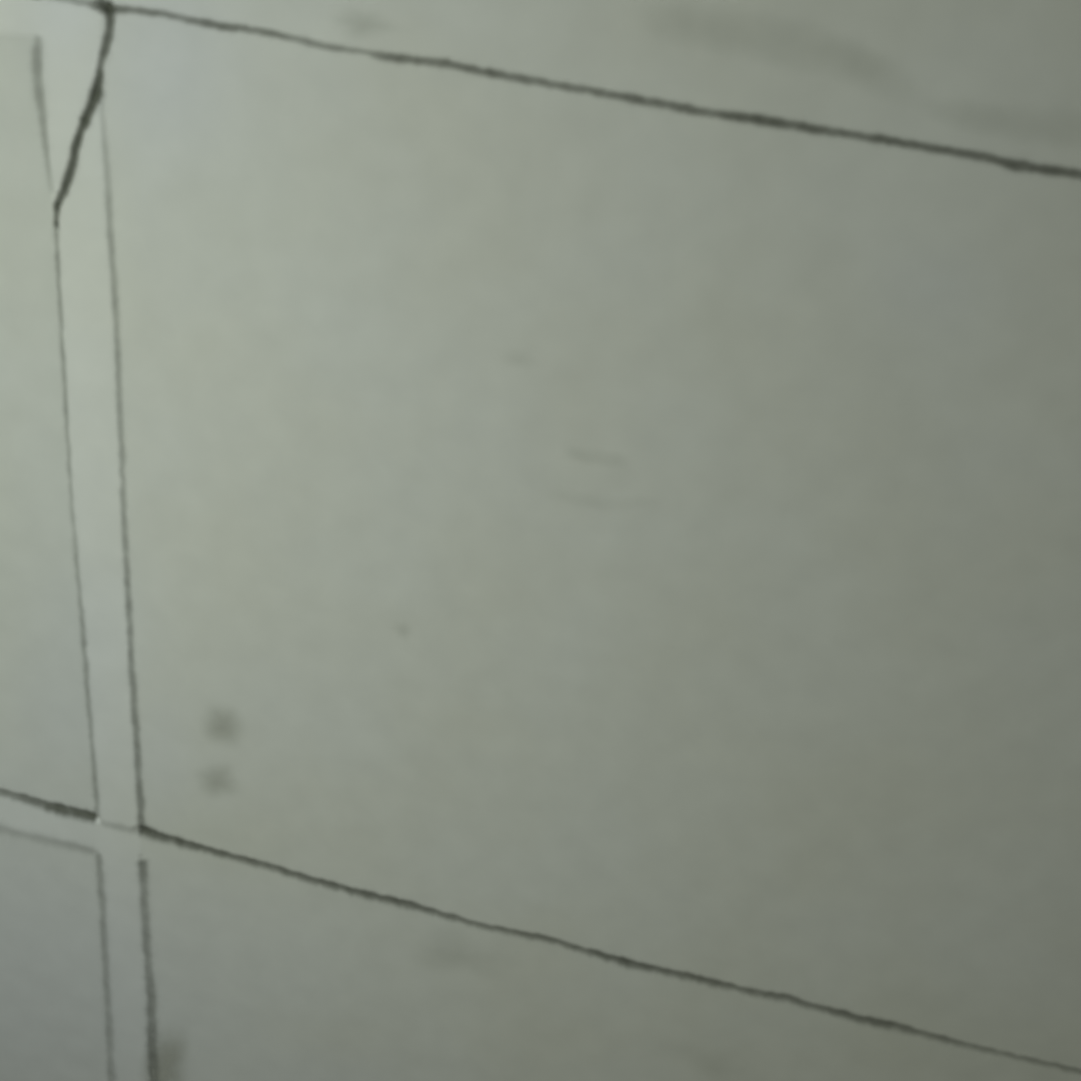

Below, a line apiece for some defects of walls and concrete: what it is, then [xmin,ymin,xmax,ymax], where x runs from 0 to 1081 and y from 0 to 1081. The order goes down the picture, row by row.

crack [204,21,233,29]
crack [465,67,498,76]
crack [54,2,126,224]
crack [680,106,825,132]
crack [872,136,1077,175]